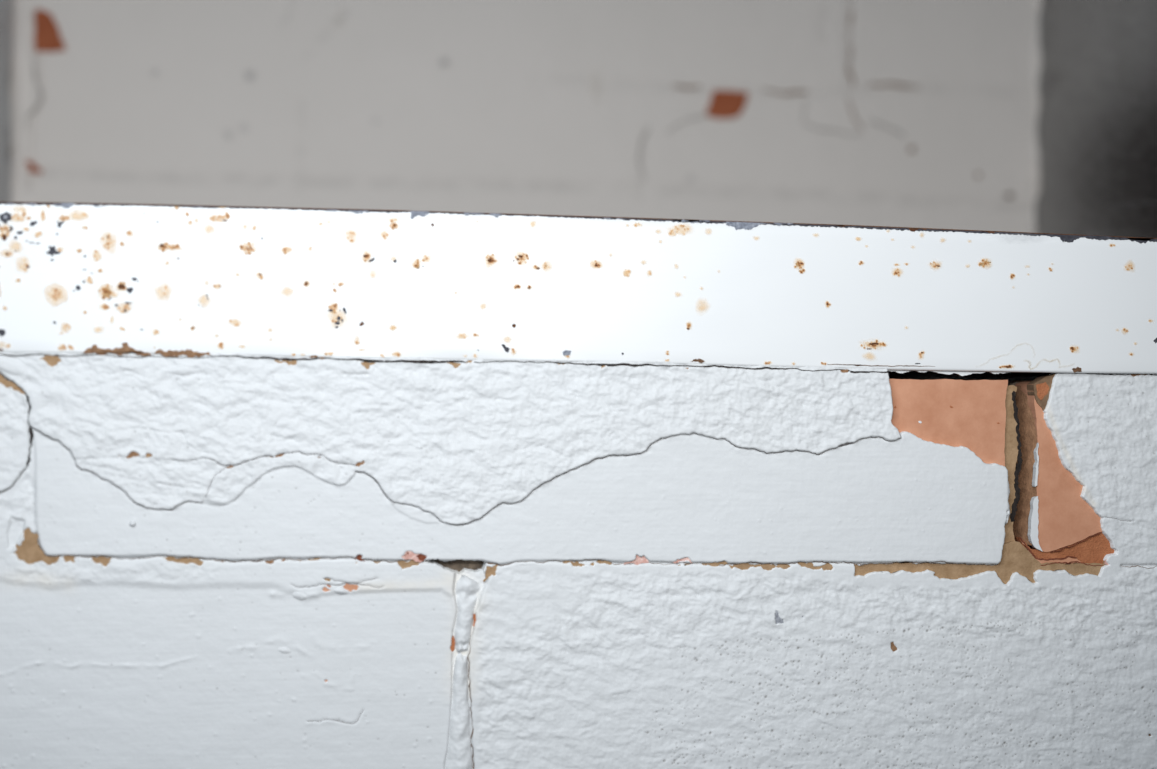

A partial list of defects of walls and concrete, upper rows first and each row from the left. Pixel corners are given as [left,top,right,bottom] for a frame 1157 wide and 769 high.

spalling [34,9,66,52]
spalling [706,90,748,119]
rust [0,205,88,281]
rust [50,231,139,313]
rust [513,253,549,269]
rust [328,283,347,328]
crack [0,354,935,526]
spalling [854,373,1114,584]
peeling [14,528,75,565]
crack [37,540,619,588]
spalling [397,552,498,582]
peeling [679,561,833,571]